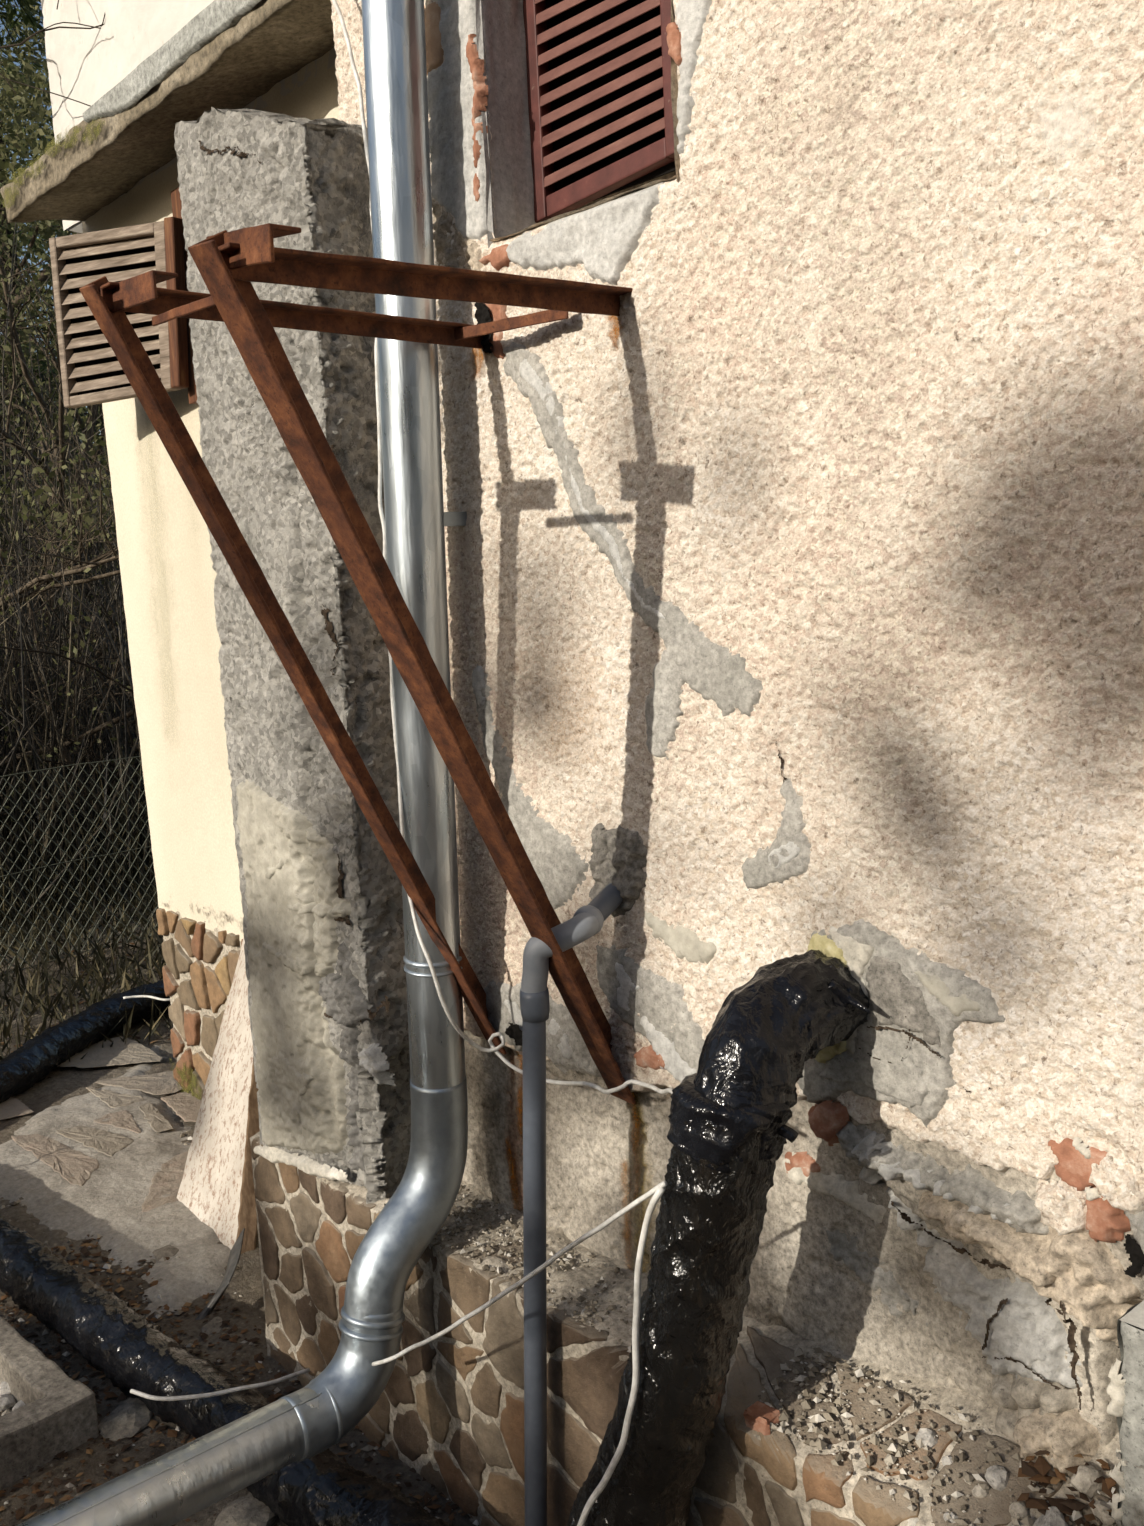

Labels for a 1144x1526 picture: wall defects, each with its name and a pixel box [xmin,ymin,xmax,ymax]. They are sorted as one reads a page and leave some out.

flaking render [424,2,444,76]
spalling [466,34,488,202]
flaking render [666,22,682,67]
spalling [432,199,510,271]
flaking render [483,303,508,359]
rust [506,1047,523,1209]
rust [625,1092,649,1273]
flaking render [785,1100,850,1177]
spalling [917,1100,1144,1348]
crack [891,1201,1082,1412]